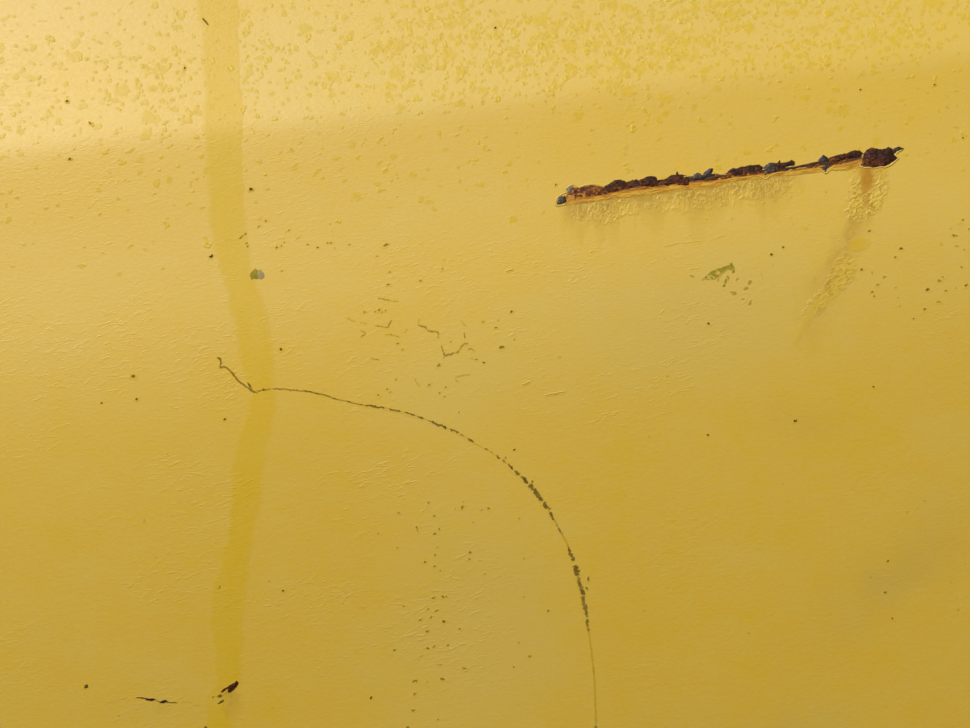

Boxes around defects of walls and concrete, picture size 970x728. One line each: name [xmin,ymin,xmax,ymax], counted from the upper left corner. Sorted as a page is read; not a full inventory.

crack [346,297,475,384]
crack [216,356,598,728]